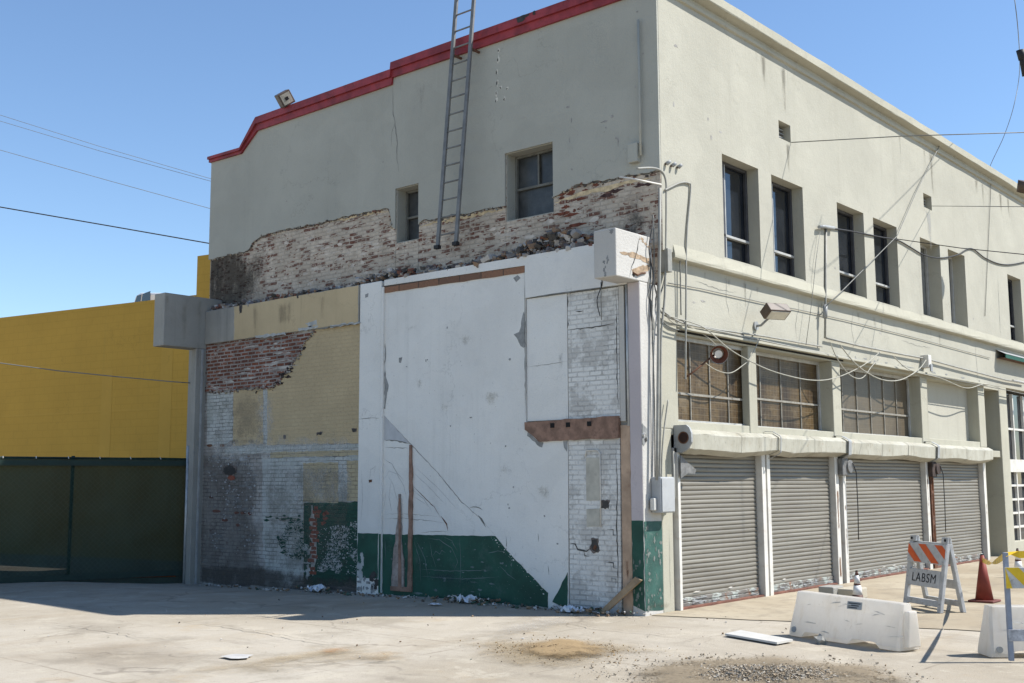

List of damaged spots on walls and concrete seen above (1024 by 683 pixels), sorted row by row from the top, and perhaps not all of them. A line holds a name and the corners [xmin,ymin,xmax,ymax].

spalling [211,171,661,313]
spalling [205,320,360,395]
spalling [514,312,526,348]
spalling [264,506,378,593]